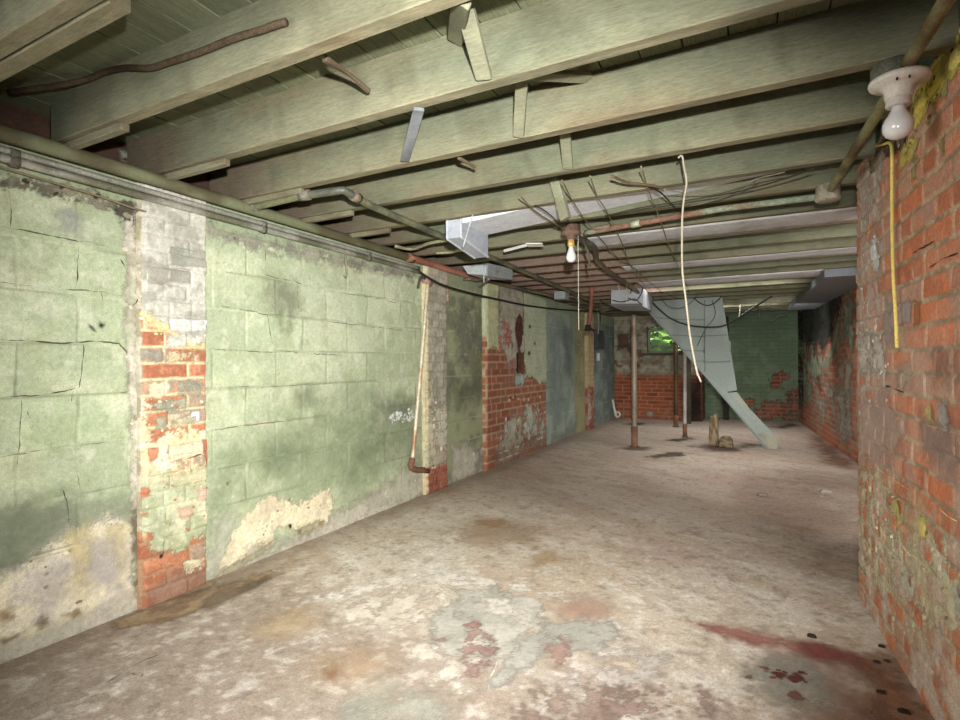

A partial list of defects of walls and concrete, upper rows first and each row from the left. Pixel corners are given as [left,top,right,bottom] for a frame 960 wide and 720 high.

crack [2,190,138,306]
crack [4,340,127,526]
peeling [0,173,483,663]
peeling [486,283,547,466]
peeling [743,290,860,455]
leakage [113,569,277,629]
peeling [308,572,582,631]
peeling [410,621,499,695]
peeling [545,636,572,665]
peeling [511,647,672,720]
peeling [696,684,717,718]
peeling [858,465,960,643]